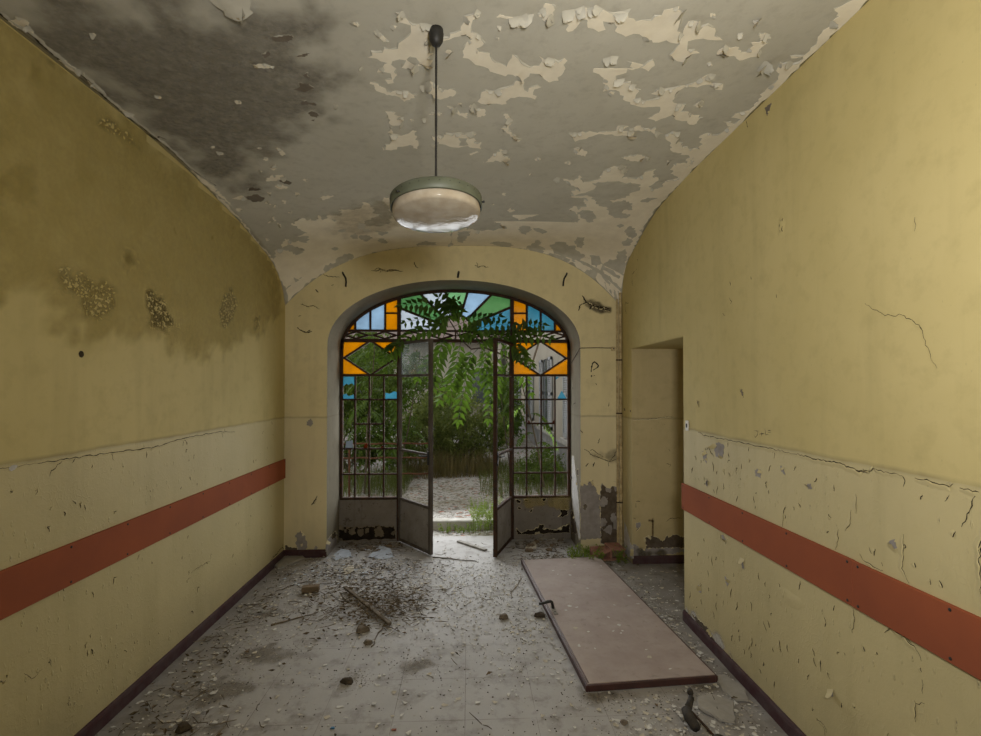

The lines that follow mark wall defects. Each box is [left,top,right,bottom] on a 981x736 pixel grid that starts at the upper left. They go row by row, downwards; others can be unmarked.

leakage [40,0,322,177]
peeling [191,0,867,303]
crack [864,304,937,369]
spalling [516,455,684,559]